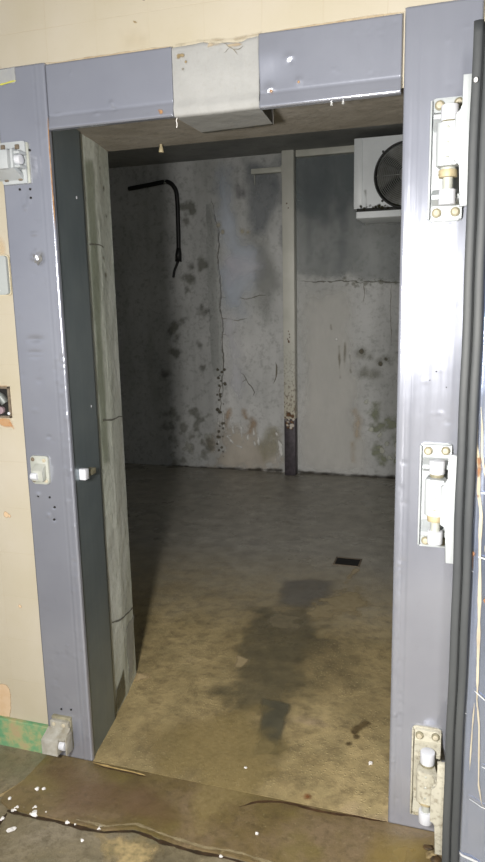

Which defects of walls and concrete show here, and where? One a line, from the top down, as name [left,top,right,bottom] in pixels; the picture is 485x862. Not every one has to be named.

crack [211,201,265,411]
leakage [298,297,397,479]
crack [305,280,400,342]
peeling [0,684,11,717]
leakage [217,580,328,755]